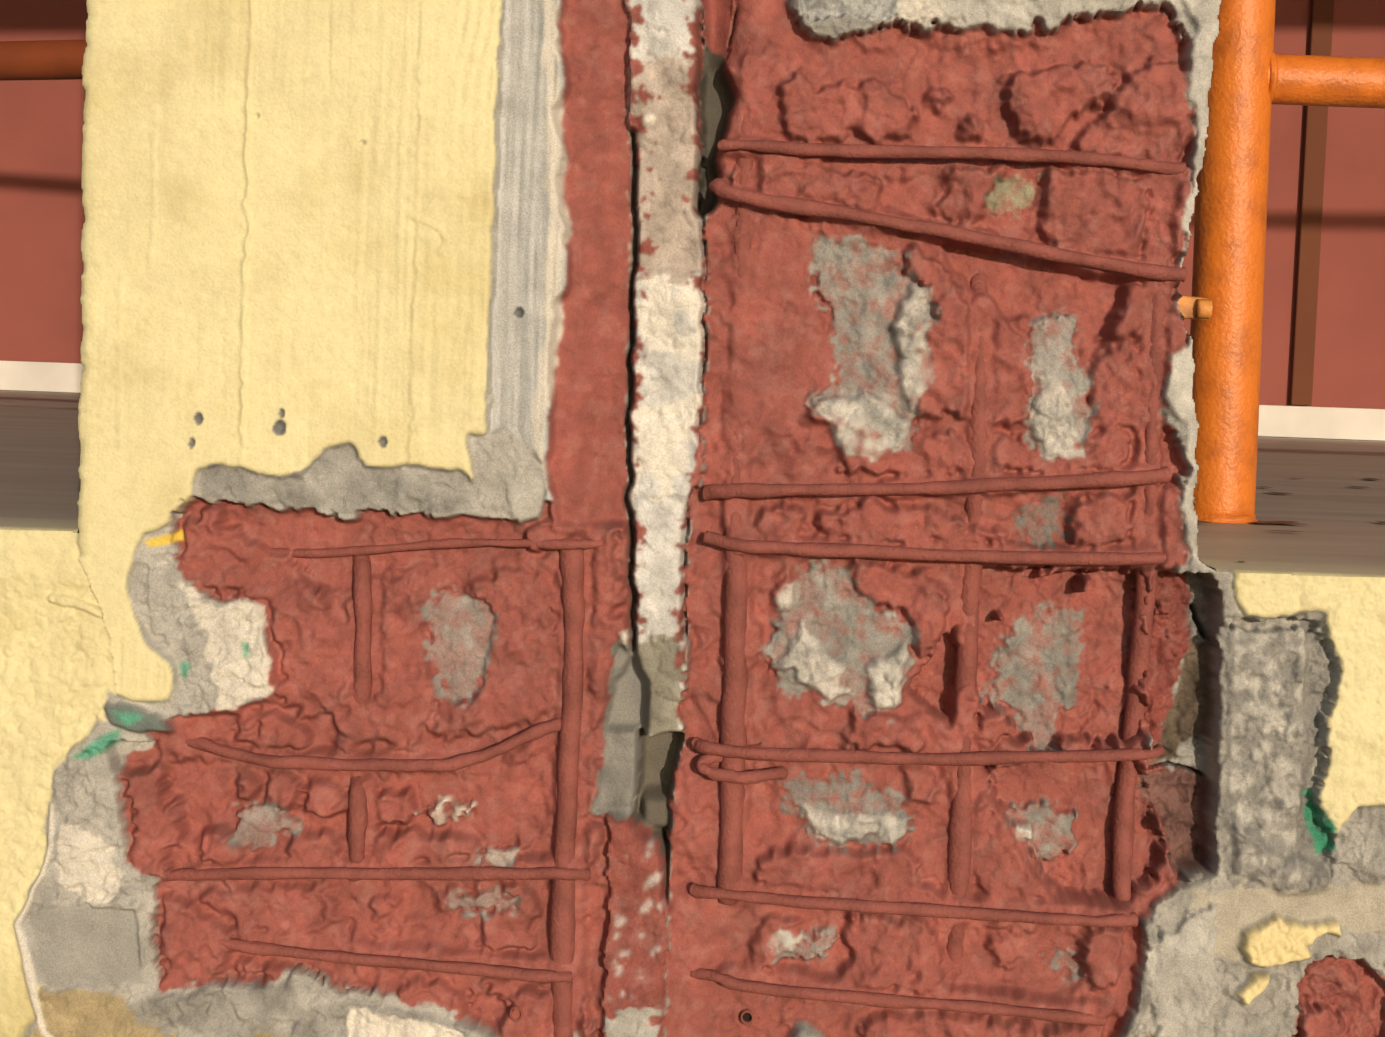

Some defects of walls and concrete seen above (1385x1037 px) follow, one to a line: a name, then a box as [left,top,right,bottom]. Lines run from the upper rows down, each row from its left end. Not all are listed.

spalling [21,0,637,1037]
spalling [664,0,1385,1037]